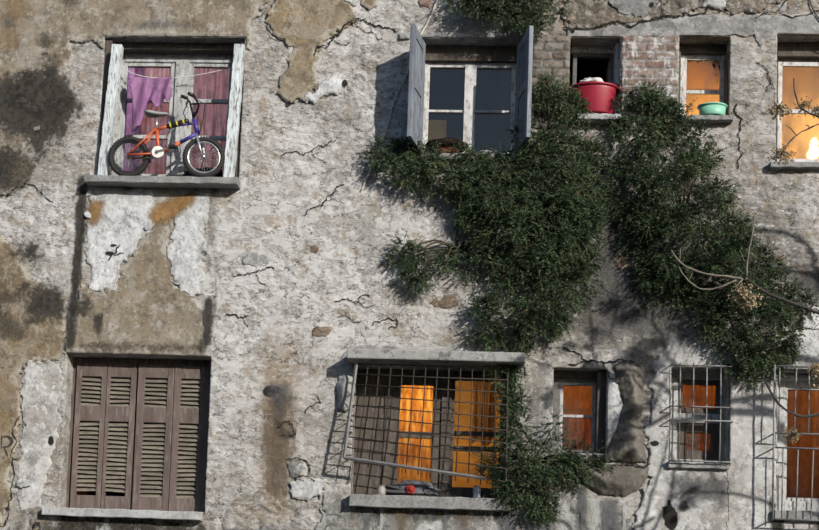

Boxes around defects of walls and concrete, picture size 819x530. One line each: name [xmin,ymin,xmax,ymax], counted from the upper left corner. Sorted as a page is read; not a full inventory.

water stain [0,36,84,189]
flaking render [0,0,377,104]
spalling [531,0,788,131]
crack [733,103,750,170]
flaking render [0,186,212,530]
water stain [261,383,293,496]
flaking render [517,361,553,451]
crack [562,347,643,379]
flaking render [607,371,623,448]
flaking render [617,304,778,530]
flaking render [791,269,819,370]
flaking render [289,477,502,530]